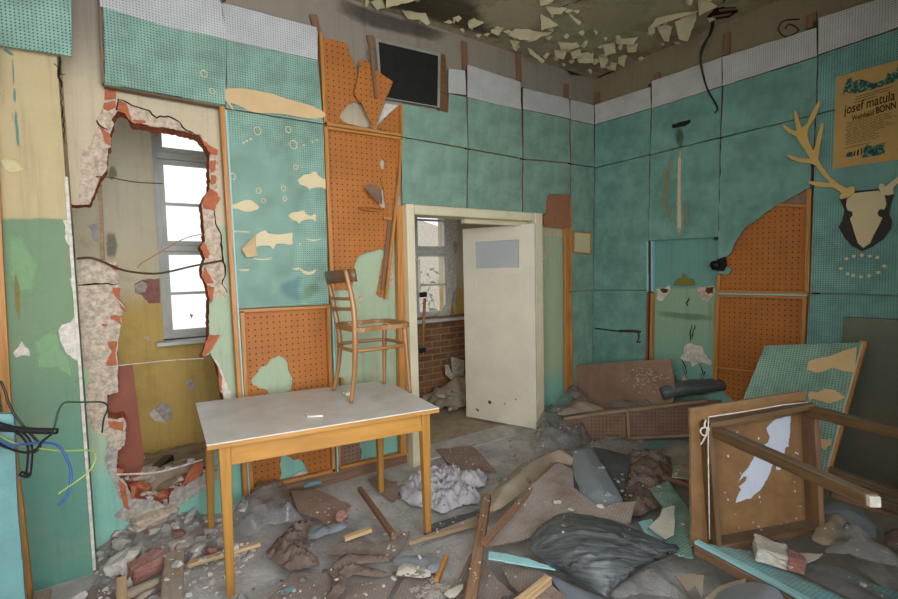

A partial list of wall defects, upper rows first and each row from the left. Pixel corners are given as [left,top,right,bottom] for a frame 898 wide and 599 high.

peeling [365,0,430,25]
peeling [444,0,738,74]
flaking render [78,90,187,205]
flaking render [200,136,227,306]
crack [214,210,227,292]
flaking render [59,260,218,524]
flaking render [202,328,231,399]